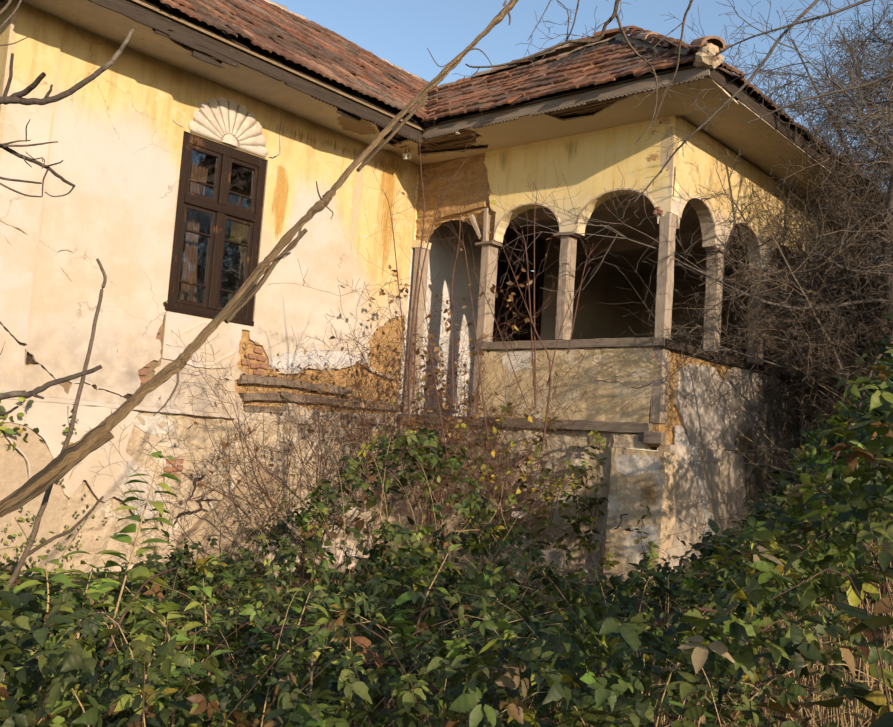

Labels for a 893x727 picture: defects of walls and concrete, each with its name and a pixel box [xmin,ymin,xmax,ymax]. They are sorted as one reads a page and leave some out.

flaking render [384,129,497,244]
crack [0,320,28,358]
damp [271,348,364,373]
crack [41,363,124,414]
flaking render [58,316,403,574]
crack [142,474,219,527]
peeling [675,425,716,542]